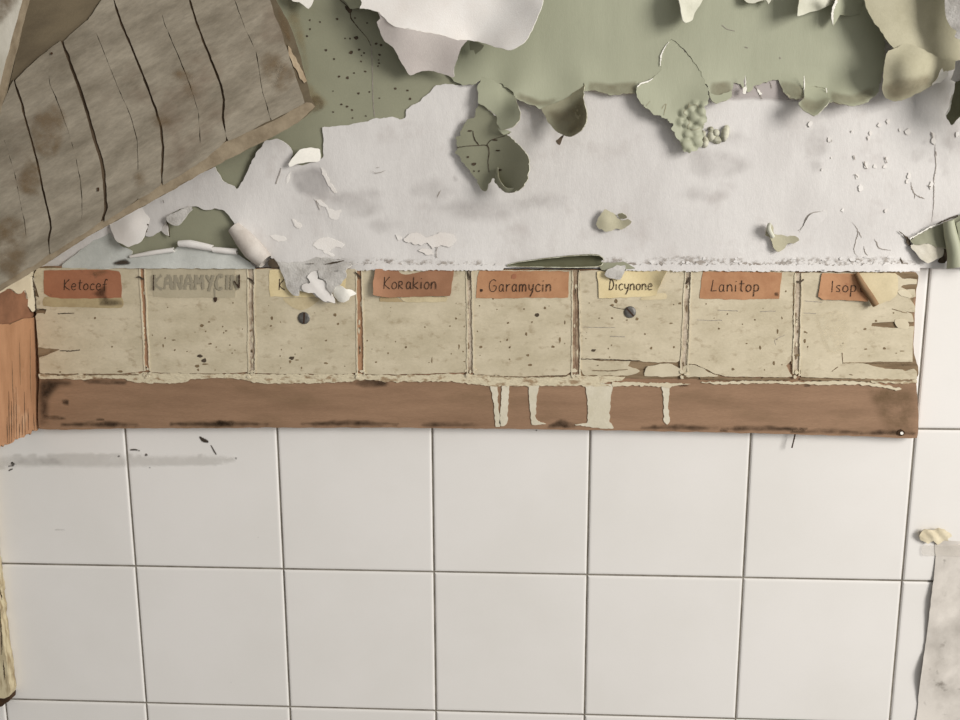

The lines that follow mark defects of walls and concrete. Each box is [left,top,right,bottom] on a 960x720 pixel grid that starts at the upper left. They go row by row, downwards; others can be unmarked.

peeling [62,0,960,325]